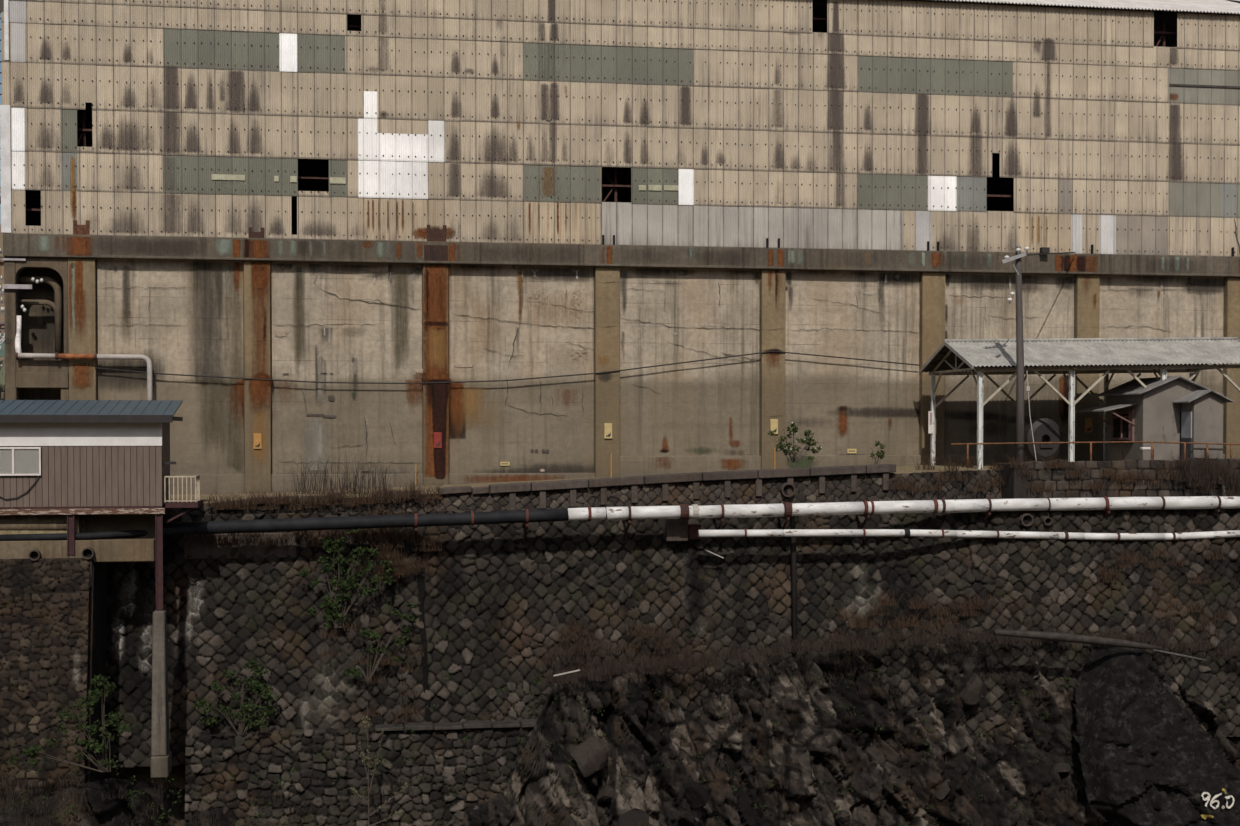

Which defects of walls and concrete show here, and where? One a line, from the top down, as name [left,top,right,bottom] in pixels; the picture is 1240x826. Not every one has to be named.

water stain [164,66,259,153]
water stain [542,84,558,162]
water stain [828,2,844,205]
water stain [917,94,929,174]
water stain [1006,101,1019,176]
water stain [1170,105,1183,180]
rust [58,354,94,388]
rust [63,237,91,330]
rust [233,239,272,456]
water stain [250,208,331,400]
rust [368,200,477,479]
crack [251,274,919,416]